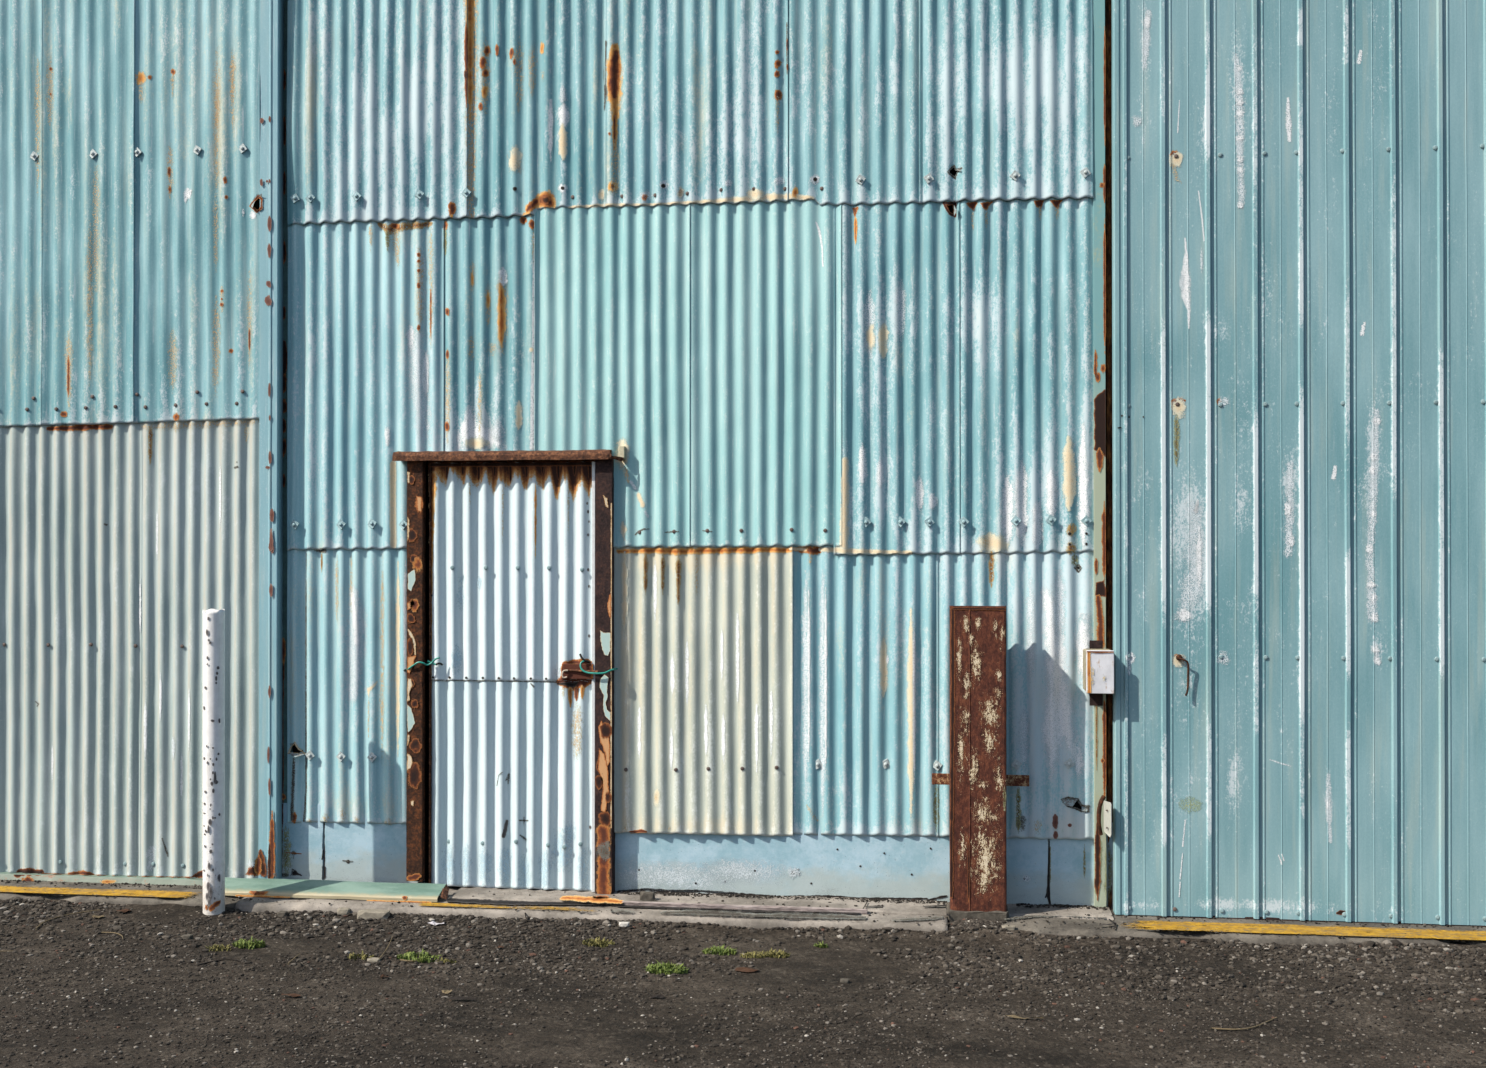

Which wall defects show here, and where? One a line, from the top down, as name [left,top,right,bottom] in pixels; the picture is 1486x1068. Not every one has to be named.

corrosion [603,40,623,195]
corrosion [368,0,596,706]
corrosion [554,658,593,756]
corrosion [950,607,1006,902]